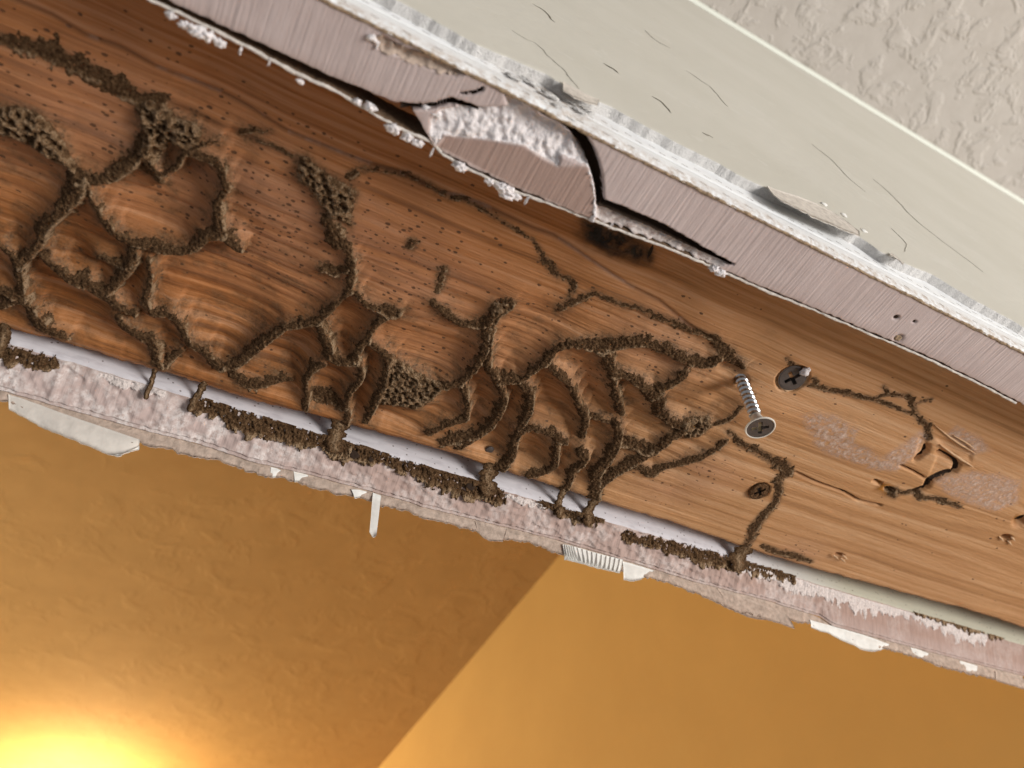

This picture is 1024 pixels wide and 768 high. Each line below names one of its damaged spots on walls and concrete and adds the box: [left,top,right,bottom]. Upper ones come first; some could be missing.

spalling [505,72,595,115]
crack [544,109,732,264]
peeling [8,394,140,457]
crack [902,443,926,476]
peeling [717,588,795,629]
peeling [809,620,890,652]
peeling [995,671,1024,689]